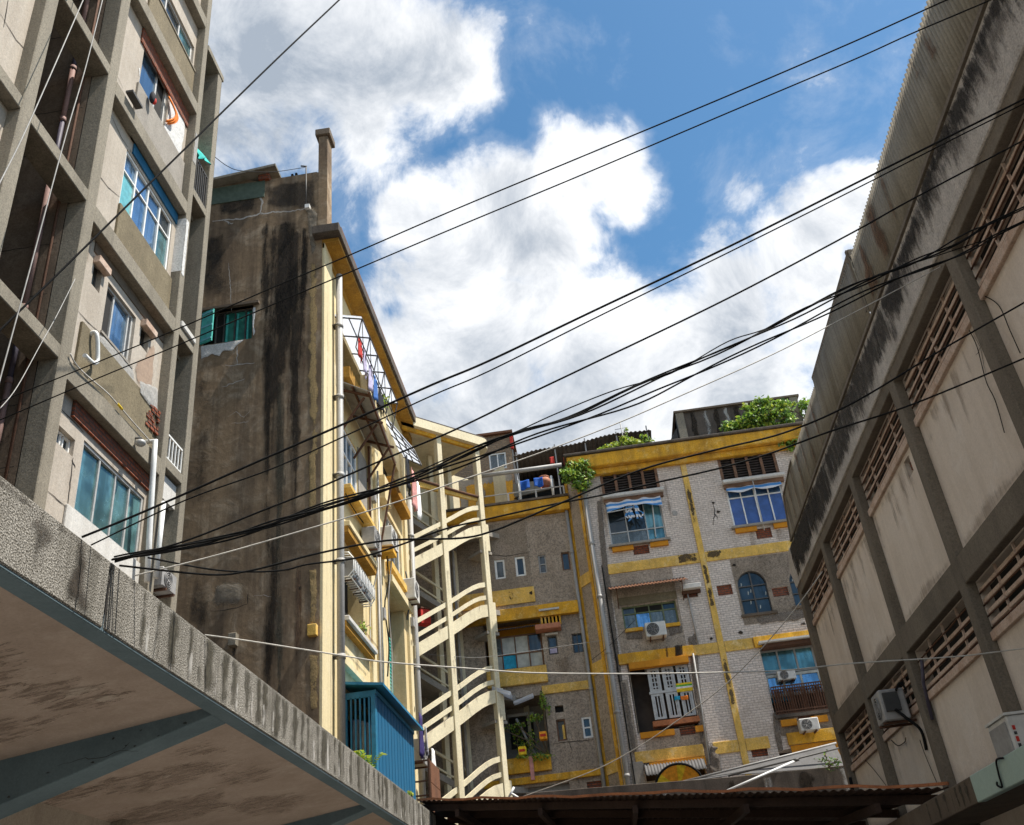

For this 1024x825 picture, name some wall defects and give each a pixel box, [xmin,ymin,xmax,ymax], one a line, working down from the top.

crack [217,198,305,224]
flaking render [201,307,255,359]
leakage [790,0,1019,576]
spalling [136,346,161,436]
leakage [140,221,433,825]
leakage [69,547,87,608]